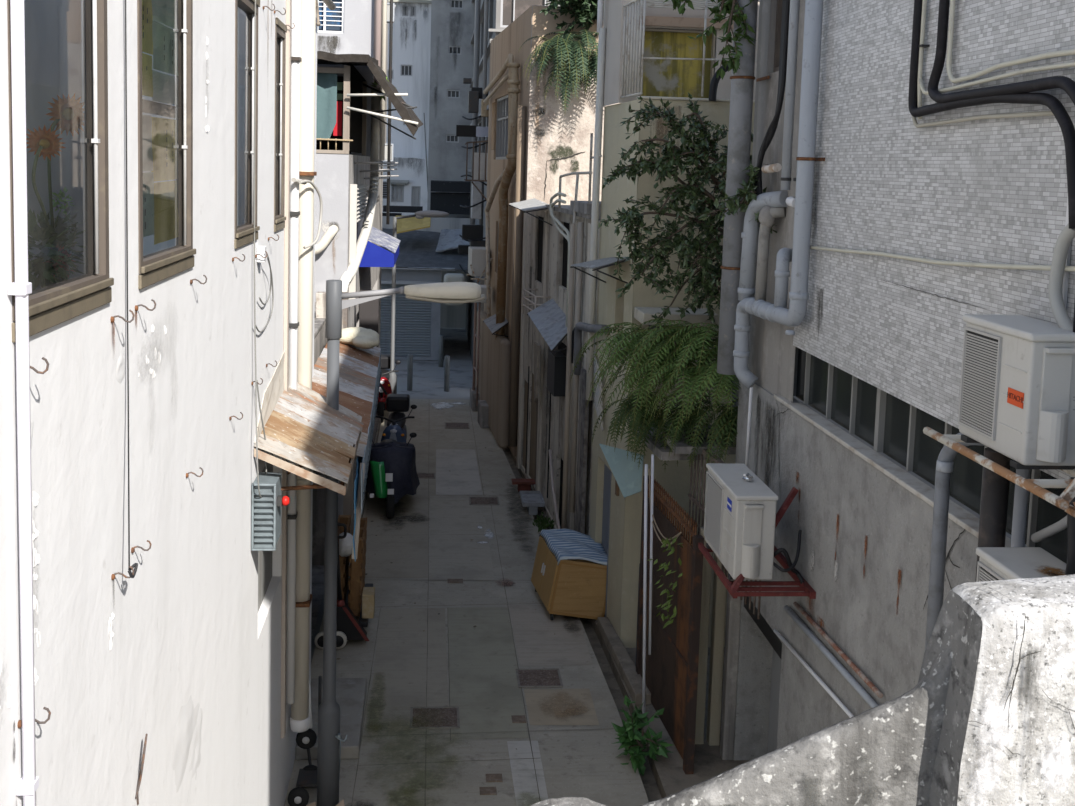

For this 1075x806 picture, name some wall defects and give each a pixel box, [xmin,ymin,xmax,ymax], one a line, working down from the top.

crack [923,529,1041,755]